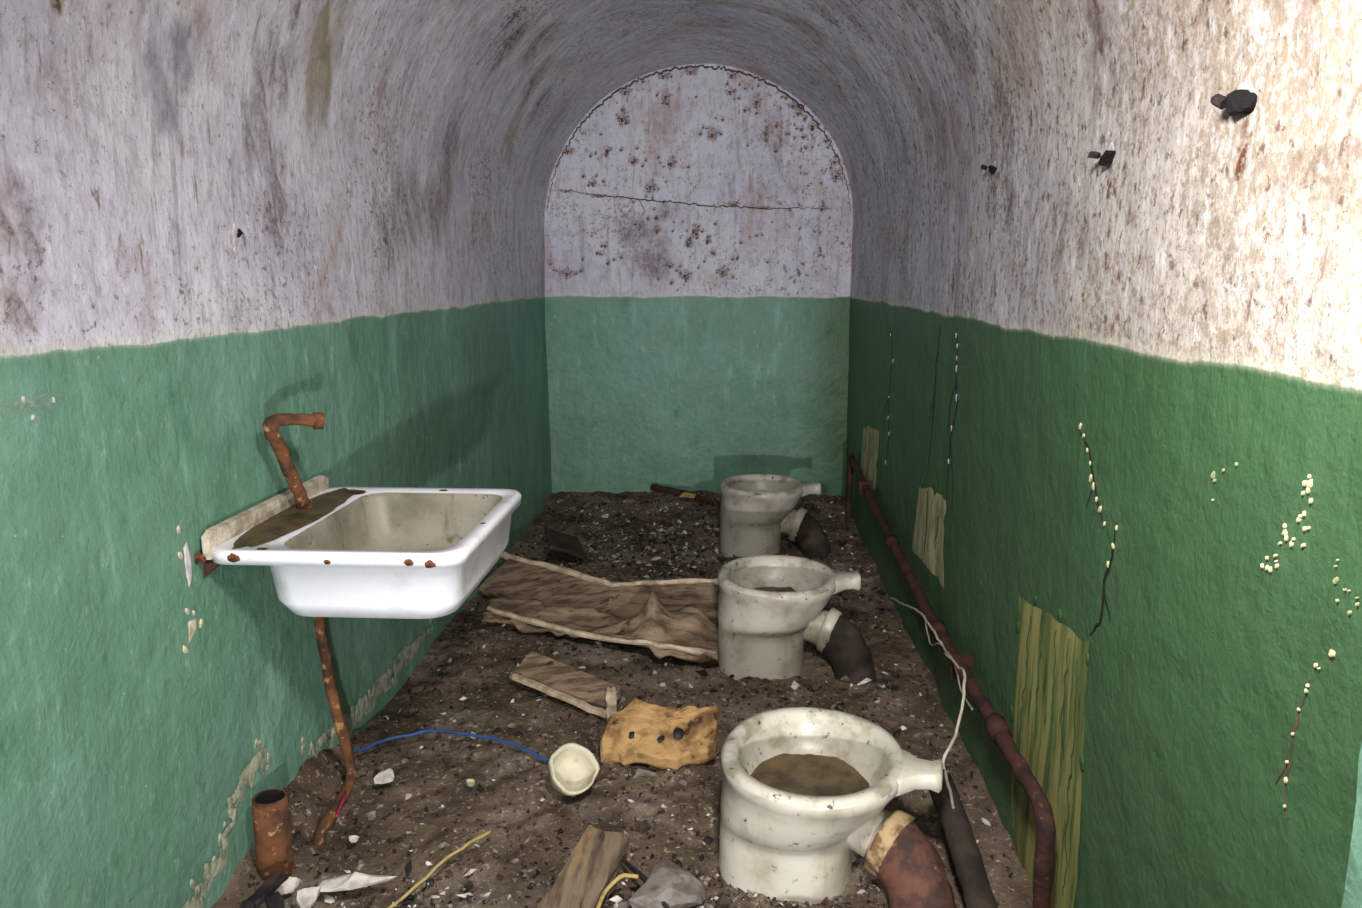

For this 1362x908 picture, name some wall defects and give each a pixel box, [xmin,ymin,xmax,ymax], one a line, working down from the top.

spalling [1238,80,1254,92]
crack [1078,423,1118,636]